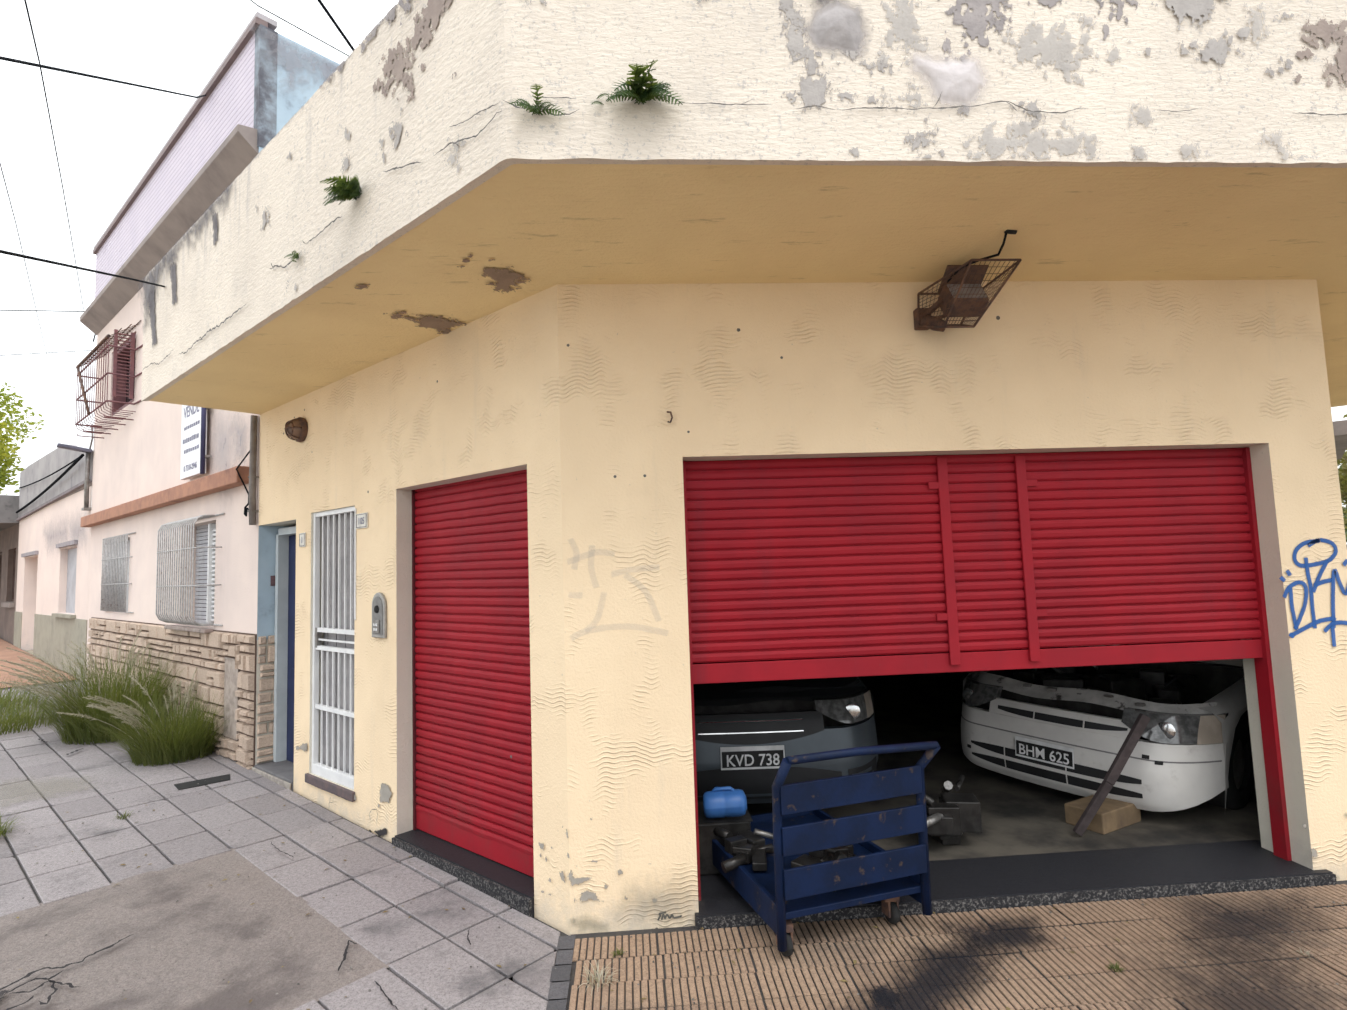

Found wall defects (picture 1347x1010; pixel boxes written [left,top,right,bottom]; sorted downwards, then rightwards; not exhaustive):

peeling [373,0,452,163]
crack [385,97,579,172]
crack [676,92,1080,113]
peeling [779,0,1347,160]
crack [1295,110,1347,118]
leakage [143,186,229,346]
peeling [457,254,531,294]
peeling [383,311,467,334]
spalling [539,826,607,902]